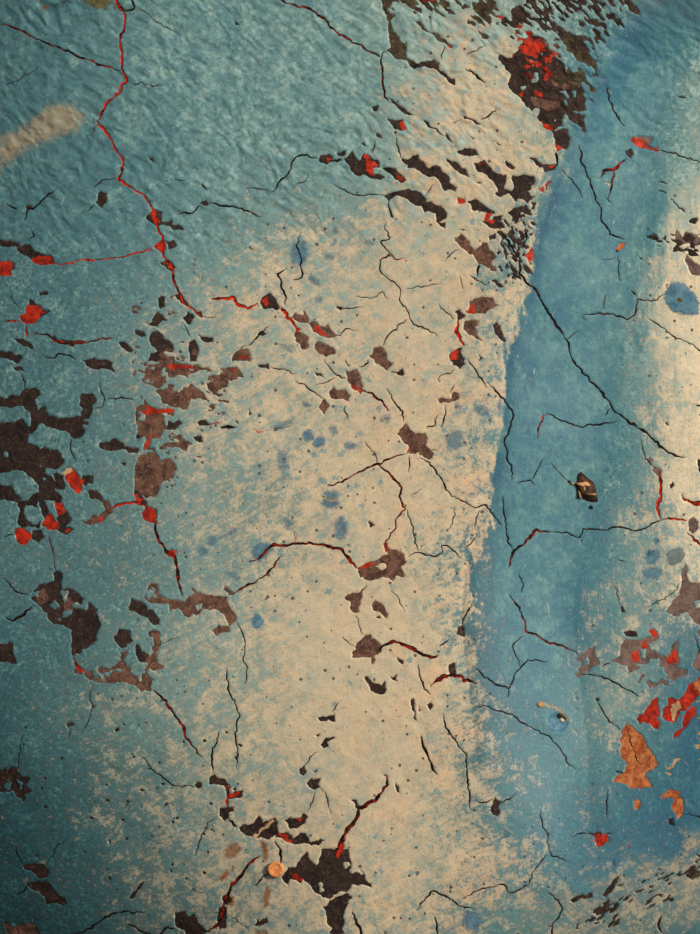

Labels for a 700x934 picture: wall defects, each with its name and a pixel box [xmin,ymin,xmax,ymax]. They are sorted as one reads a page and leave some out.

peeling [0,232,152,276]
crack [0,0,269,318]
crack [293,232,304,280]
crack [357,223,464,345]
peeling [273,0,640,382]
peeling [646,181,700,276]
peeling [0,268,461,757]
crack [411,233,700,816]
peeling [575,564,700,809]
peeling [132,734,399,934]
crack [416,811,567,910]
peeling [548,854,700,934]